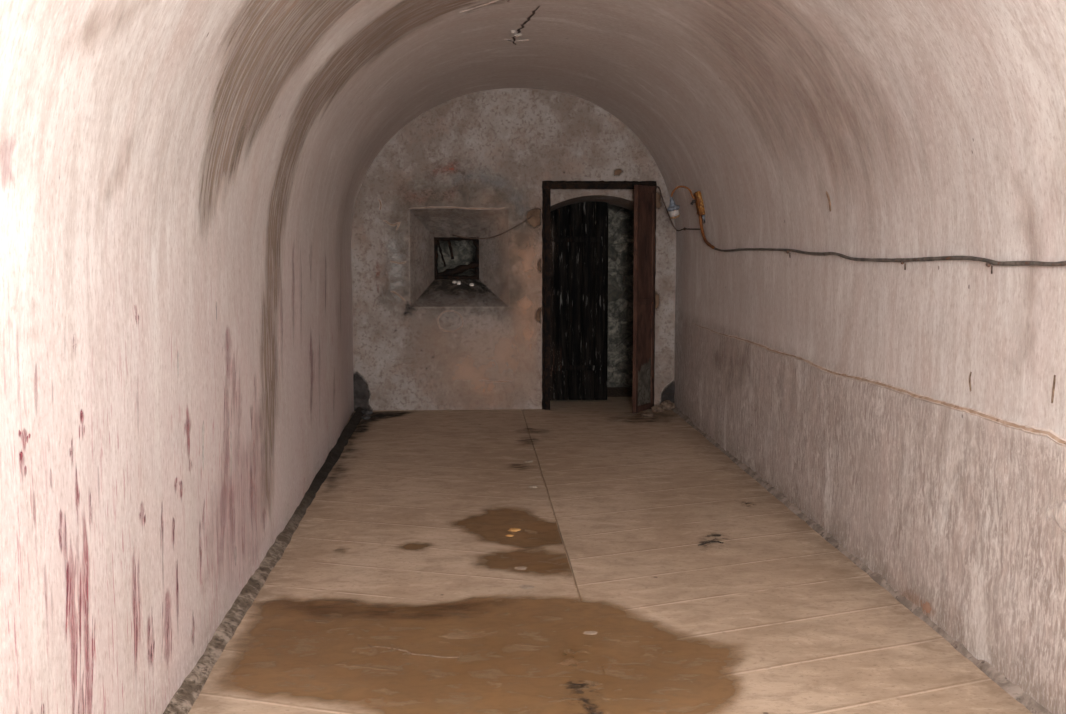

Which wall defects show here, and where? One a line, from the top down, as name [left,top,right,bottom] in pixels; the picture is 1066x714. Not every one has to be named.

damp [200,0,360,216]
damp [262,0,504,497]
crack [692,323,1066,447]
rust [66,529,95,713]
damp [225,597,738,714]
damp [455,508,571,574]